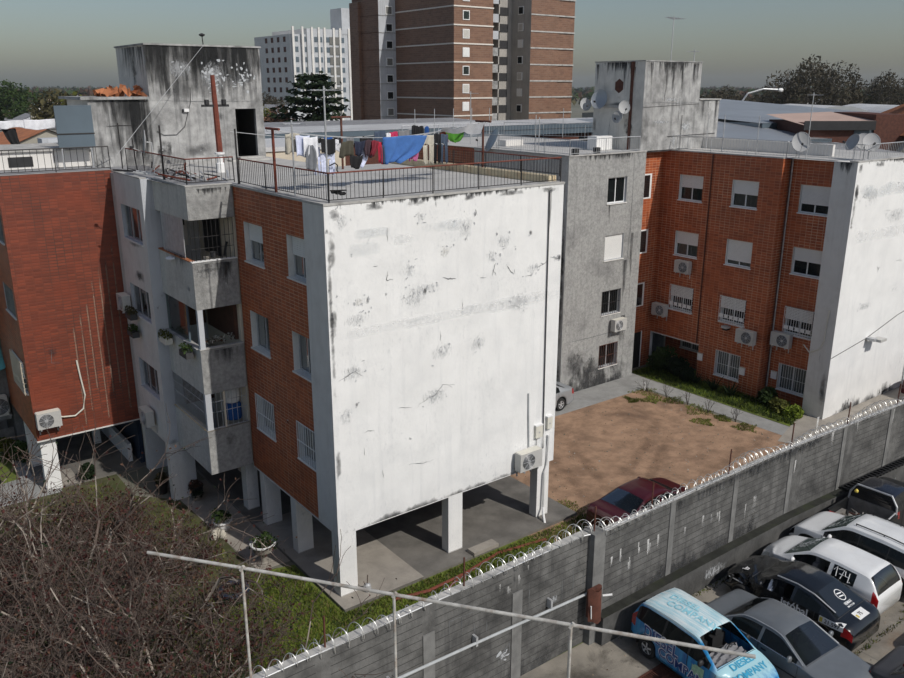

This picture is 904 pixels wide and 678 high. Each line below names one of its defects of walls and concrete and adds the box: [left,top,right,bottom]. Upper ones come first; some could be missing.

leakage [122,45,257,96]
leakage [98,100,148,148]
leakage [569,355,621,392]